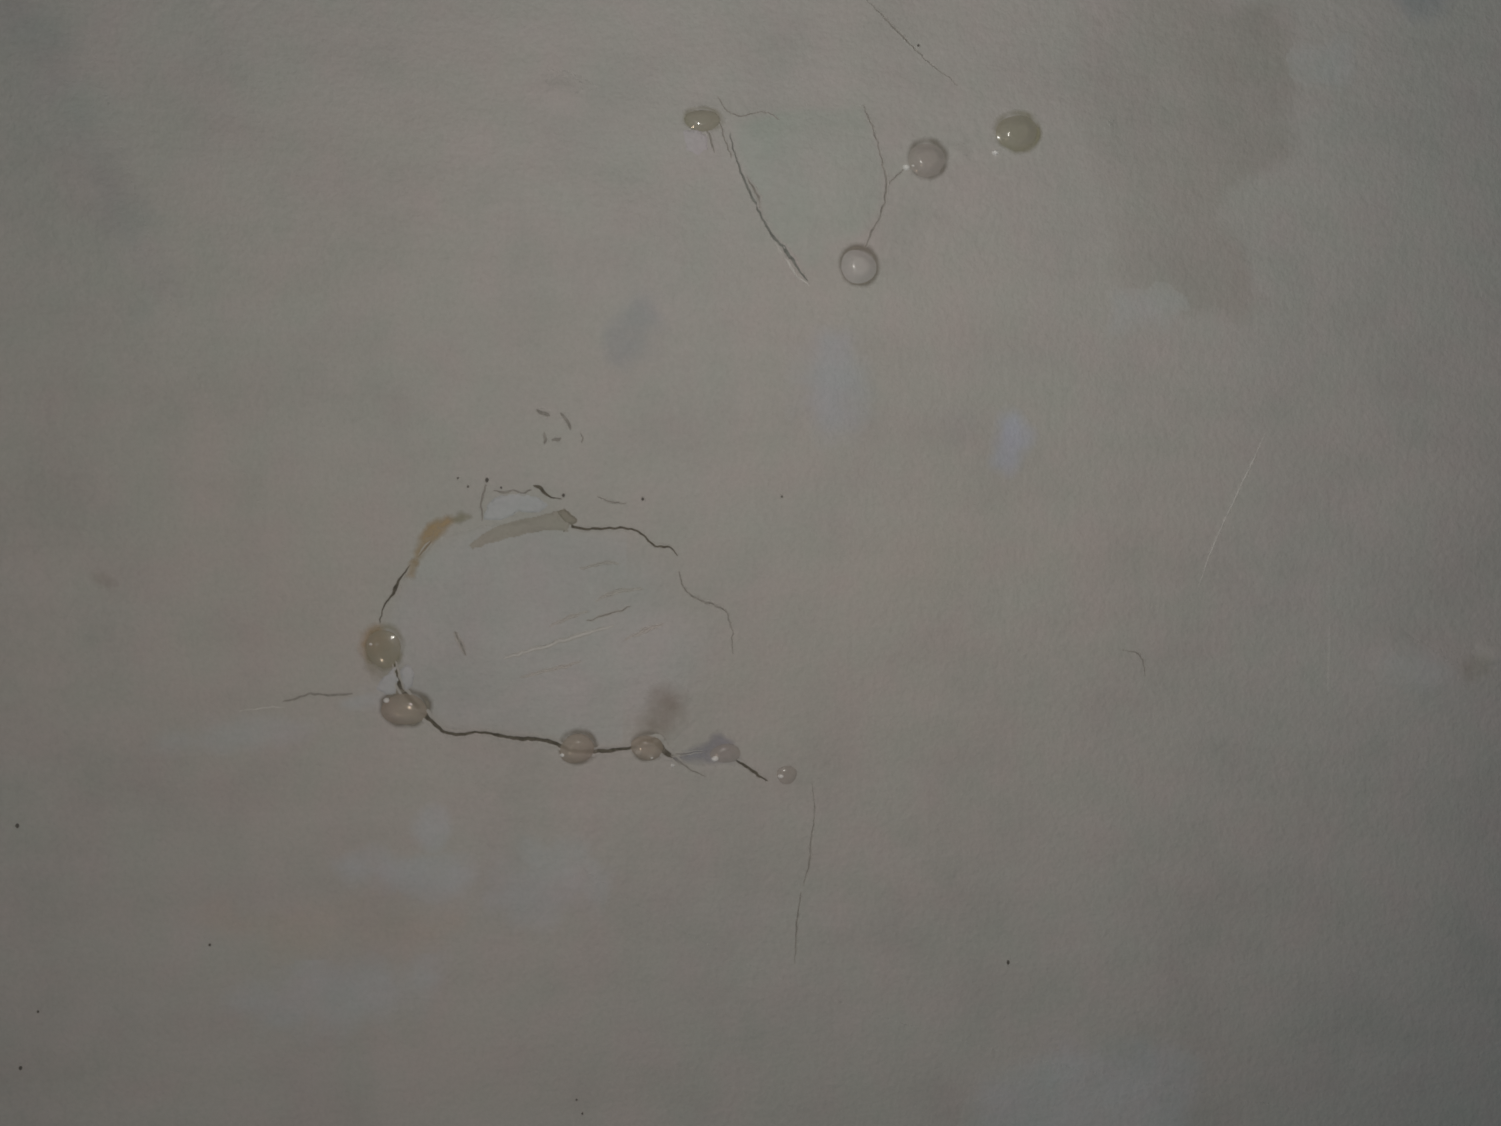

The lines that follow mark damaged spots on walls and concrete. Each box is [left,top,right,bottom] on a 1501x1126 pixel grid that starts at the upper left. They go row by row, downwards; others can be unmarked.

crack [866,0,959,86]
crack [717,96,810,287]
crack [863,105,904,247]
crack [378,541,432,624]
peeling [469,494,577,549]
crack [456,475,734,654]
crack [239,661,768,782]
crack [794,781,816,963]